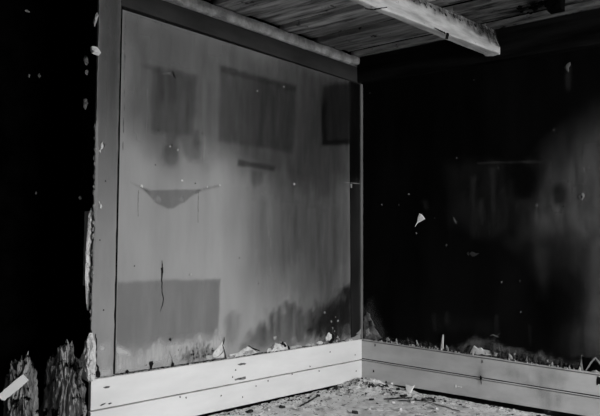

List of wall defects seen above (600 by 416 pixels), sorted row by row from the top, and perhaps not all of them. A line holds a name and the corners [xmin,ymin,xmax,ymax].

spalling [79,121,105,382]
crack [158,263,166,312]
damp [310,288,351,338]